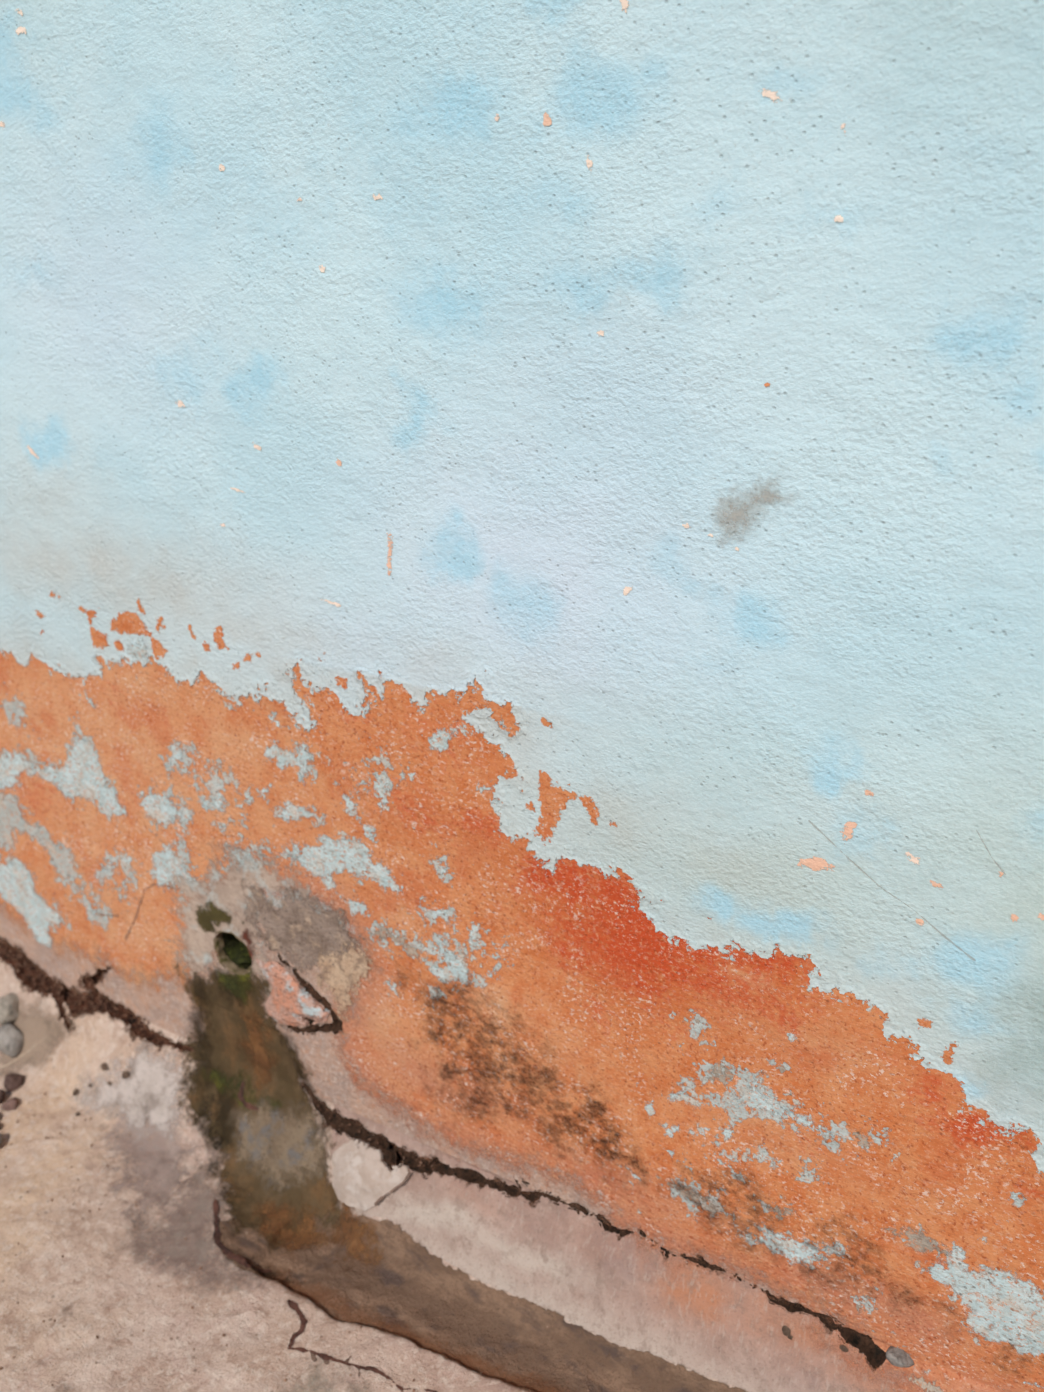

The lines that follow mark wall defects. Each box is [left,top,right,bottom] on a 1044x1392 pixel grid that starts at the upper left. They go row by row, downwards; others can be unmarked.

crack [0,883,194,1069]
crack [268,947,343,1036]
peeling [0,599,1044,1392]
water stain [426,984,619,1159]
crack [212,1199,271,1273]
water stain [76,1041,745,1392]
crack [301,1082,887,1371]
water stain [678,1176,759,1234]
crack [287,1300,437,1392]